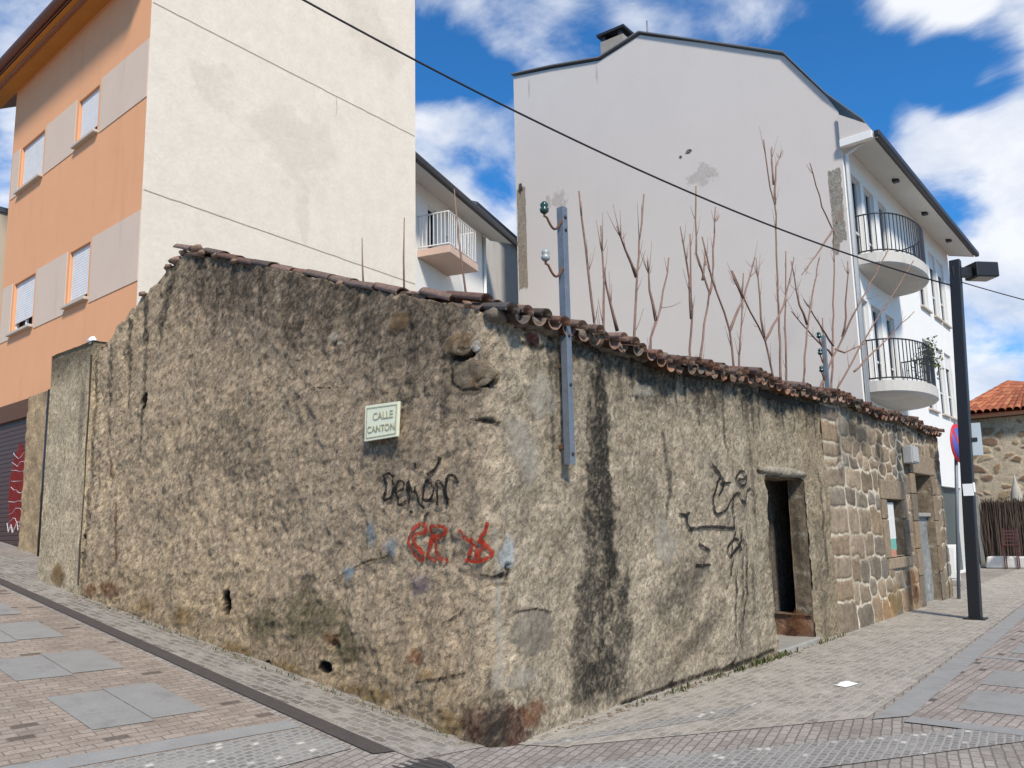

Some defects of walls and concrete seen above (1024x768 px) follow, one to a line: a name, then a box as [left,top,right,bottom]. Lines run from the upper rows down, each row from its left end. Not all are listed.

spalling [828,168,847,255]
spalling [444,332,500,394]
water stain [547,341,821,704]